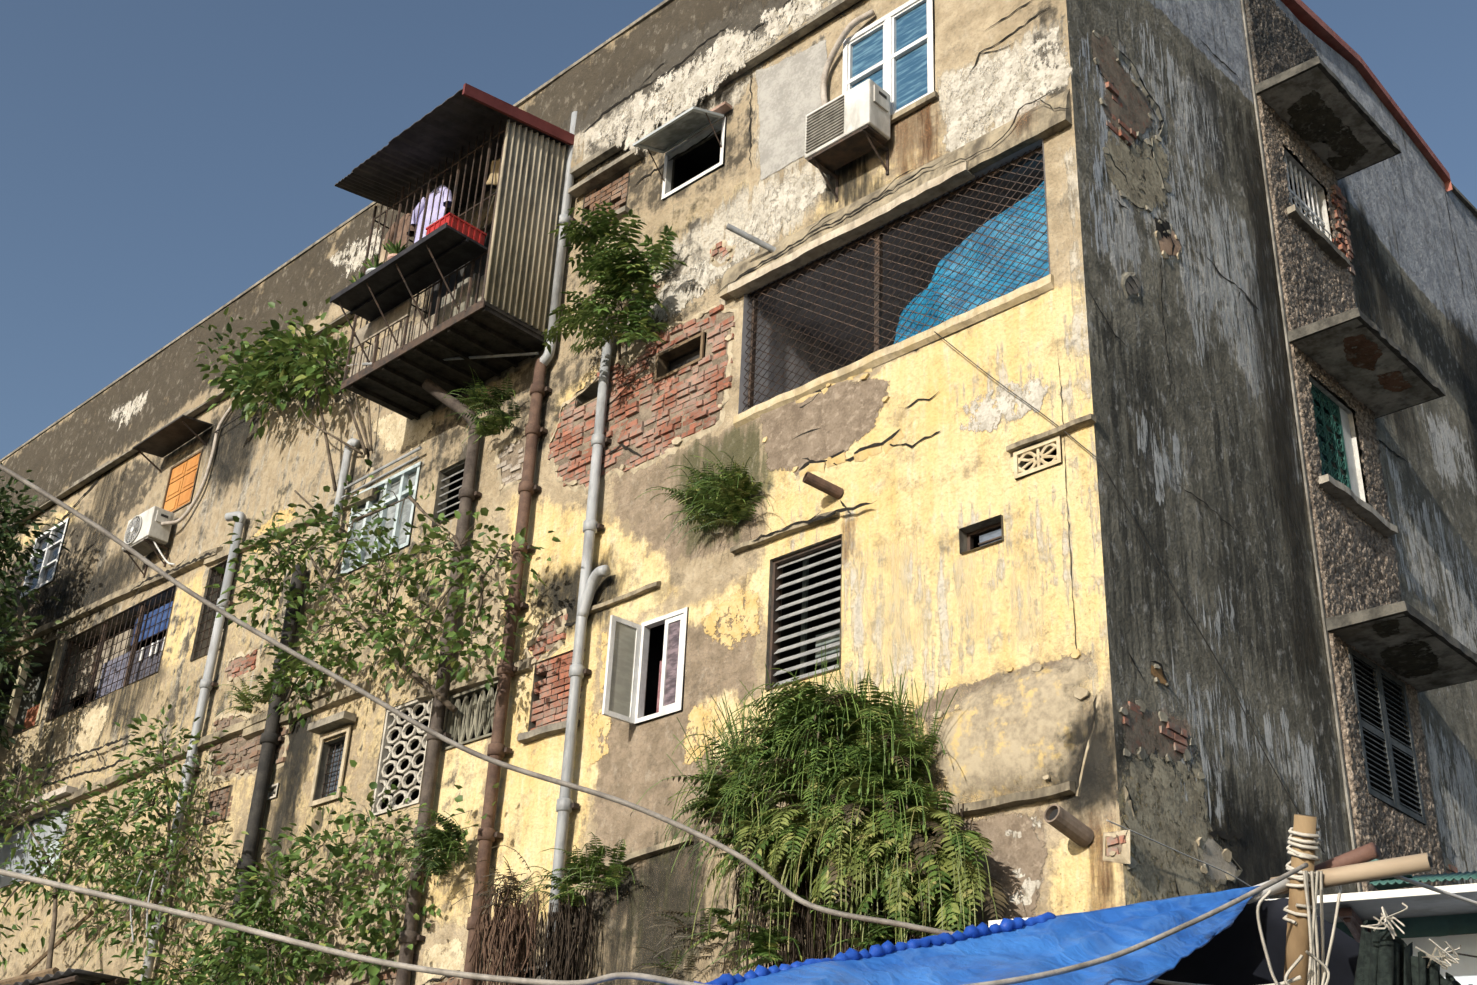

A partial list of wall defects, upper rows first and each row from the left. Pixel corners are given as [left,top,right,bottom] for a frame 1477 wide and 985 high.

damp [1078,33,1116,255]
peeling [1089,30,1182,264]
damp [31,466,151,649]
peeling [108,391,148,431]
spalling [523,608,568,668]
damp [528,555,625,633]
spalling [494,0,831,496]
crack [753,368,940,541]
peeling [959,378,1050,433]
damp [1125,10,1318,673]
efflorescence [1383,448,1477,649]
peeling [1102,697,1243,902]